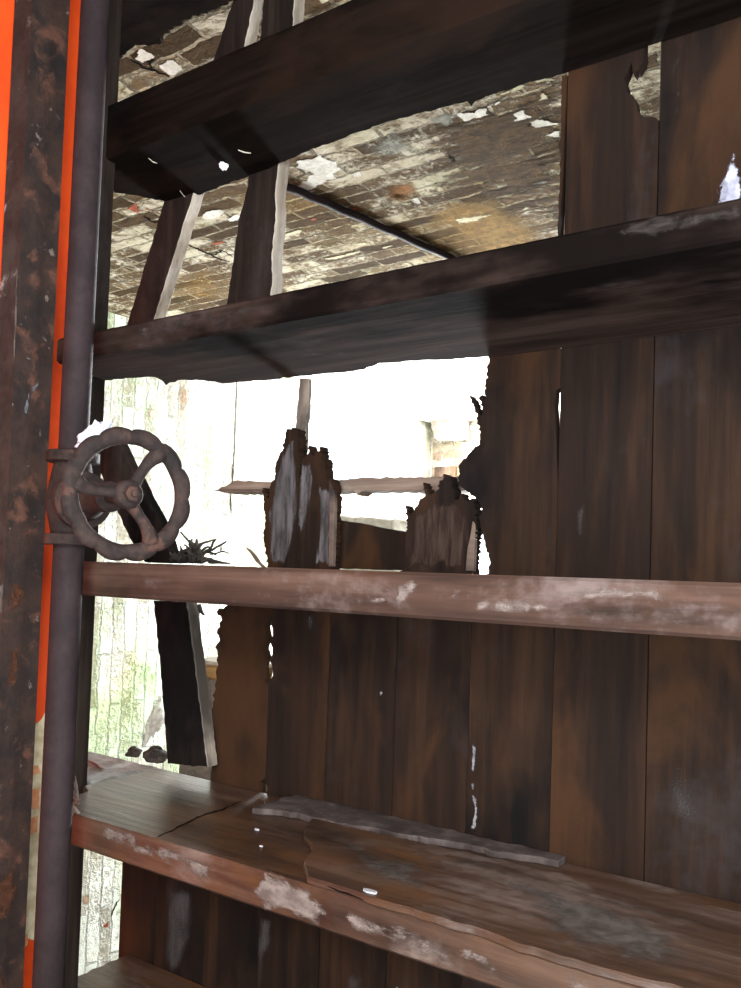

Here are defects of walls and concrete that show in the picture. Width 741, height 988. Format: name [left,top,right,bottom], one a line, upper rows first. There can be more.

peeling [136,49,182,76]
flaking render [419,79,565,229]
peeling [296,155,361,190]
peeling [719,154,741,203]
crack [157,801,241,837]